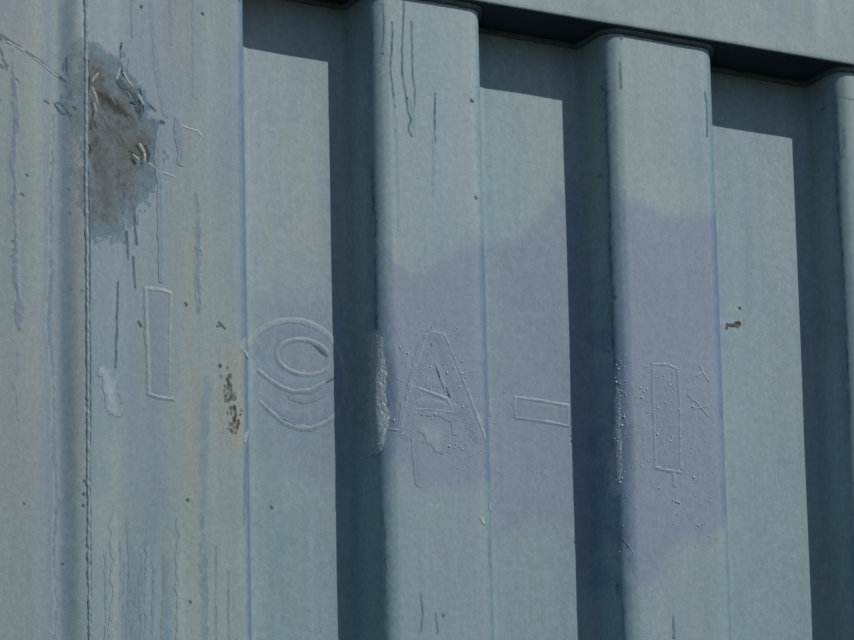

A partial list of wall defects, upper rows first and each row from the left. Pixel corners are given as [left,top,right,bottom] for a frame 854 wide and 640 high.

rust [219,363,243,434]